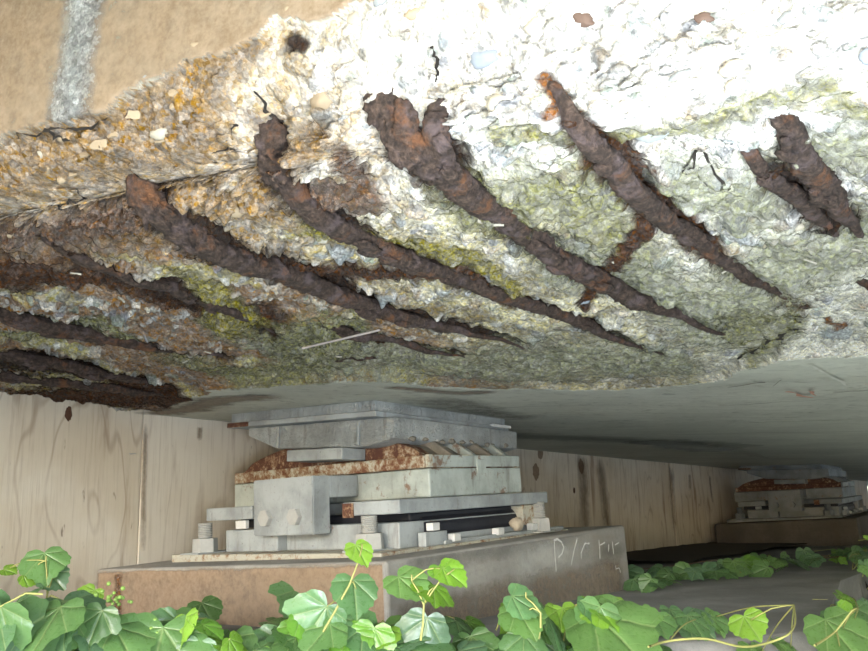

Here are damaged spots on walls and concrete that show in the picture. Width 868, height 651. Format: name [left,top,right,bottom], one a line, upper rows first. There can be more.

corrosion [0,0,810,358]
spalling [0,0,868,400]
corrosion [740,114,864,238]
corrosion [392,387,491,395]